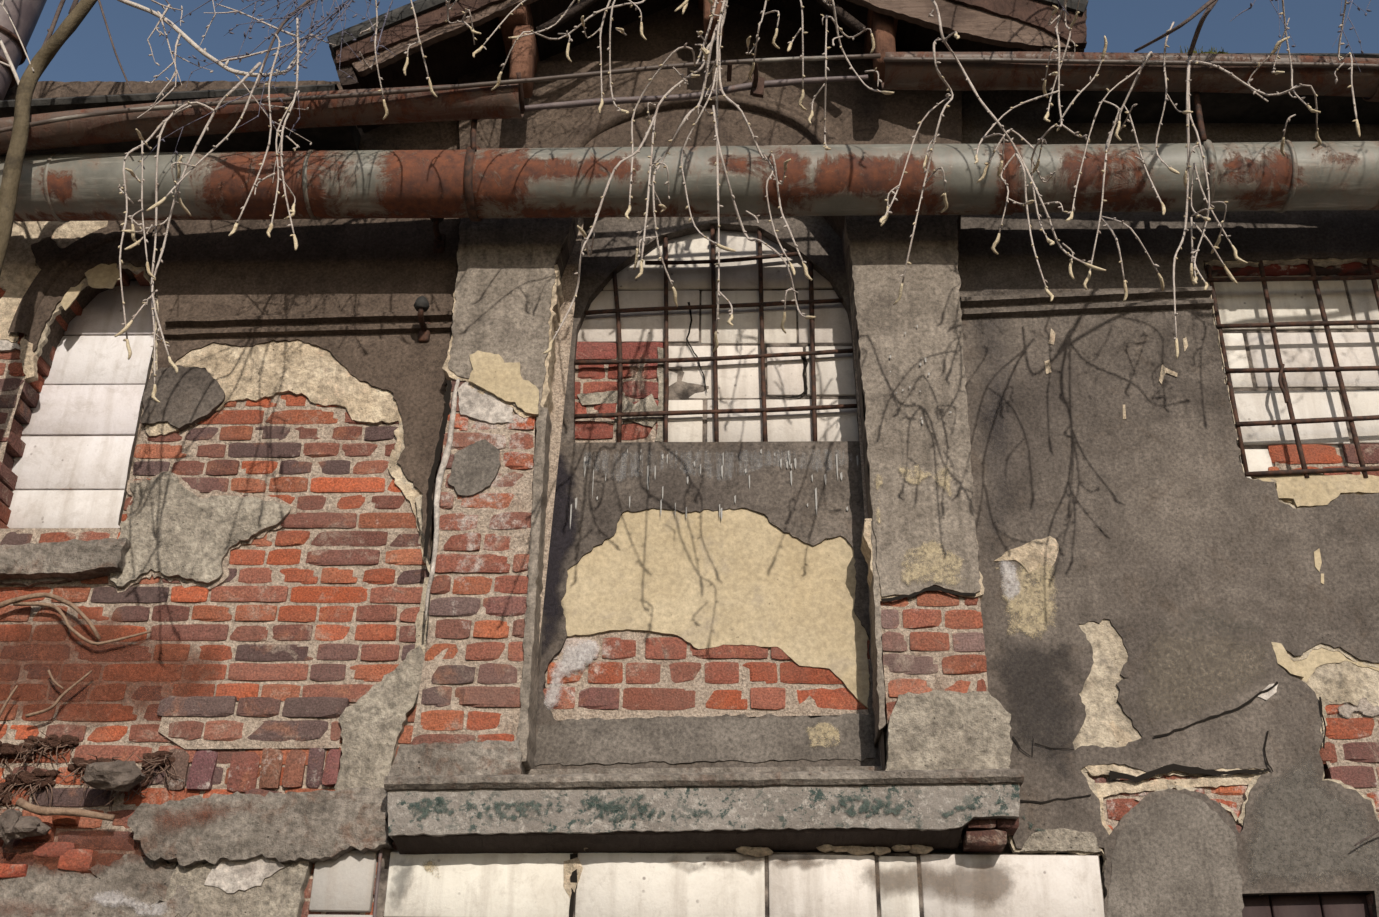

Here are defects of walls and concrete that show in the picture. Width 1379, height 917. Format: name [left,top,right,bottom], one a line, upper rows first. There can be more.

flaking render [141,340,539,621]
flaking render [1251,474,1379,508]
flaking render [1314,549,1324,585]
spalling [534,508,876,766]
crack [1153,682,1278,737]
flaking render [1147,639,1379,818]
crack [1263,731,1273,772]
crack [1318,697,1326,748]
spalling [0,815,96,878]
flaking render [204,856,286,893]
flaking render [94,892,163,915]